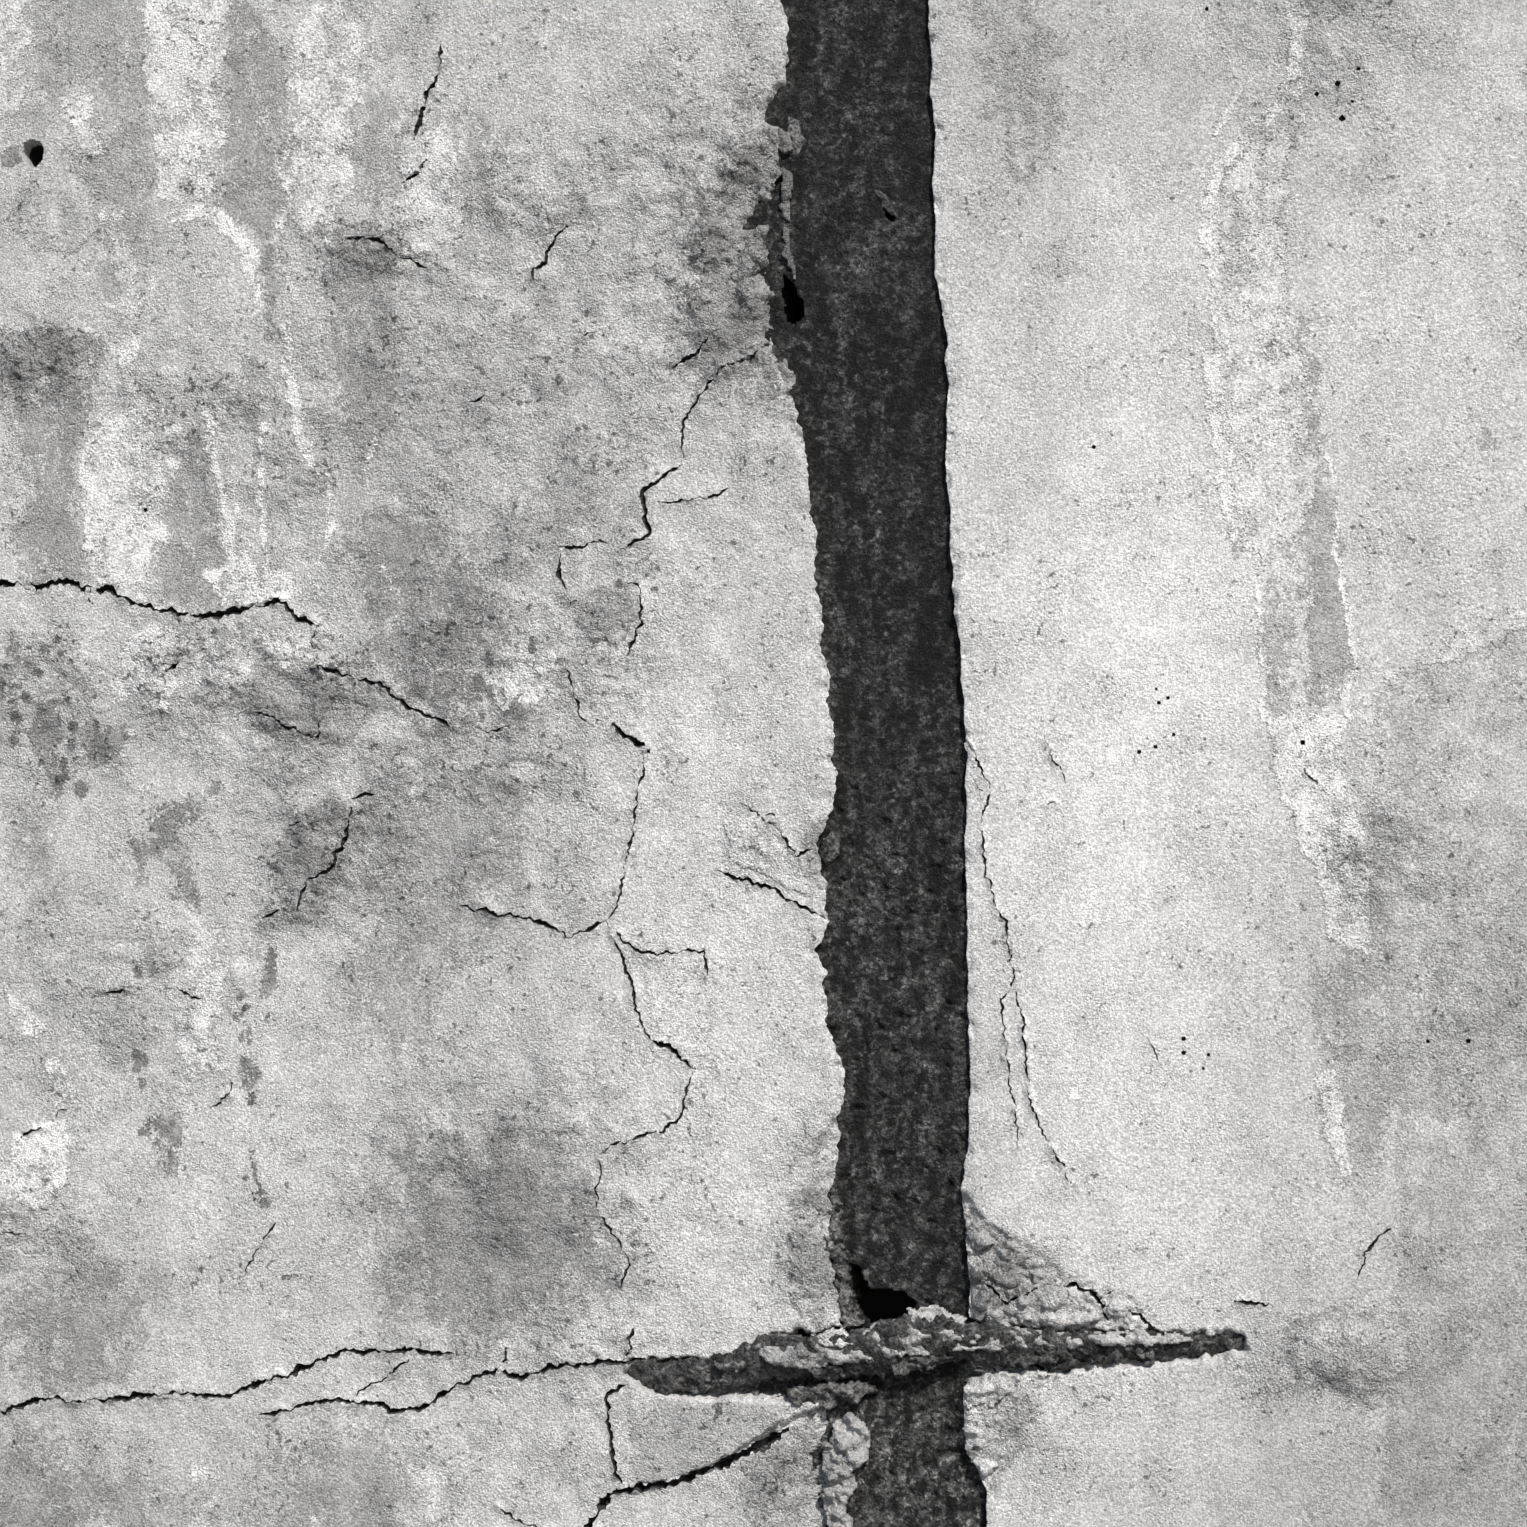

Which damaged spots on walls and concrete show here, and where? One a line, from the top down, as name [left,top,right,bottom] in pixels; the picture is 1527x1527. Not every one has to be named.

crack [401,43,478,184]
crack [553,339,762,656]
crack [0,577,508,733]
crack [255,708,324,743]
crack [261,790,378,918]
crack [716,802,828,919]
crack [460,658,711,1287]
crack [964,736,1069,1182]
crack [21,1107,71,1138]
crack [0,1328,789,1527]
peeling [891,1355,954,1378]
spalling [961,1181,1214,1495]